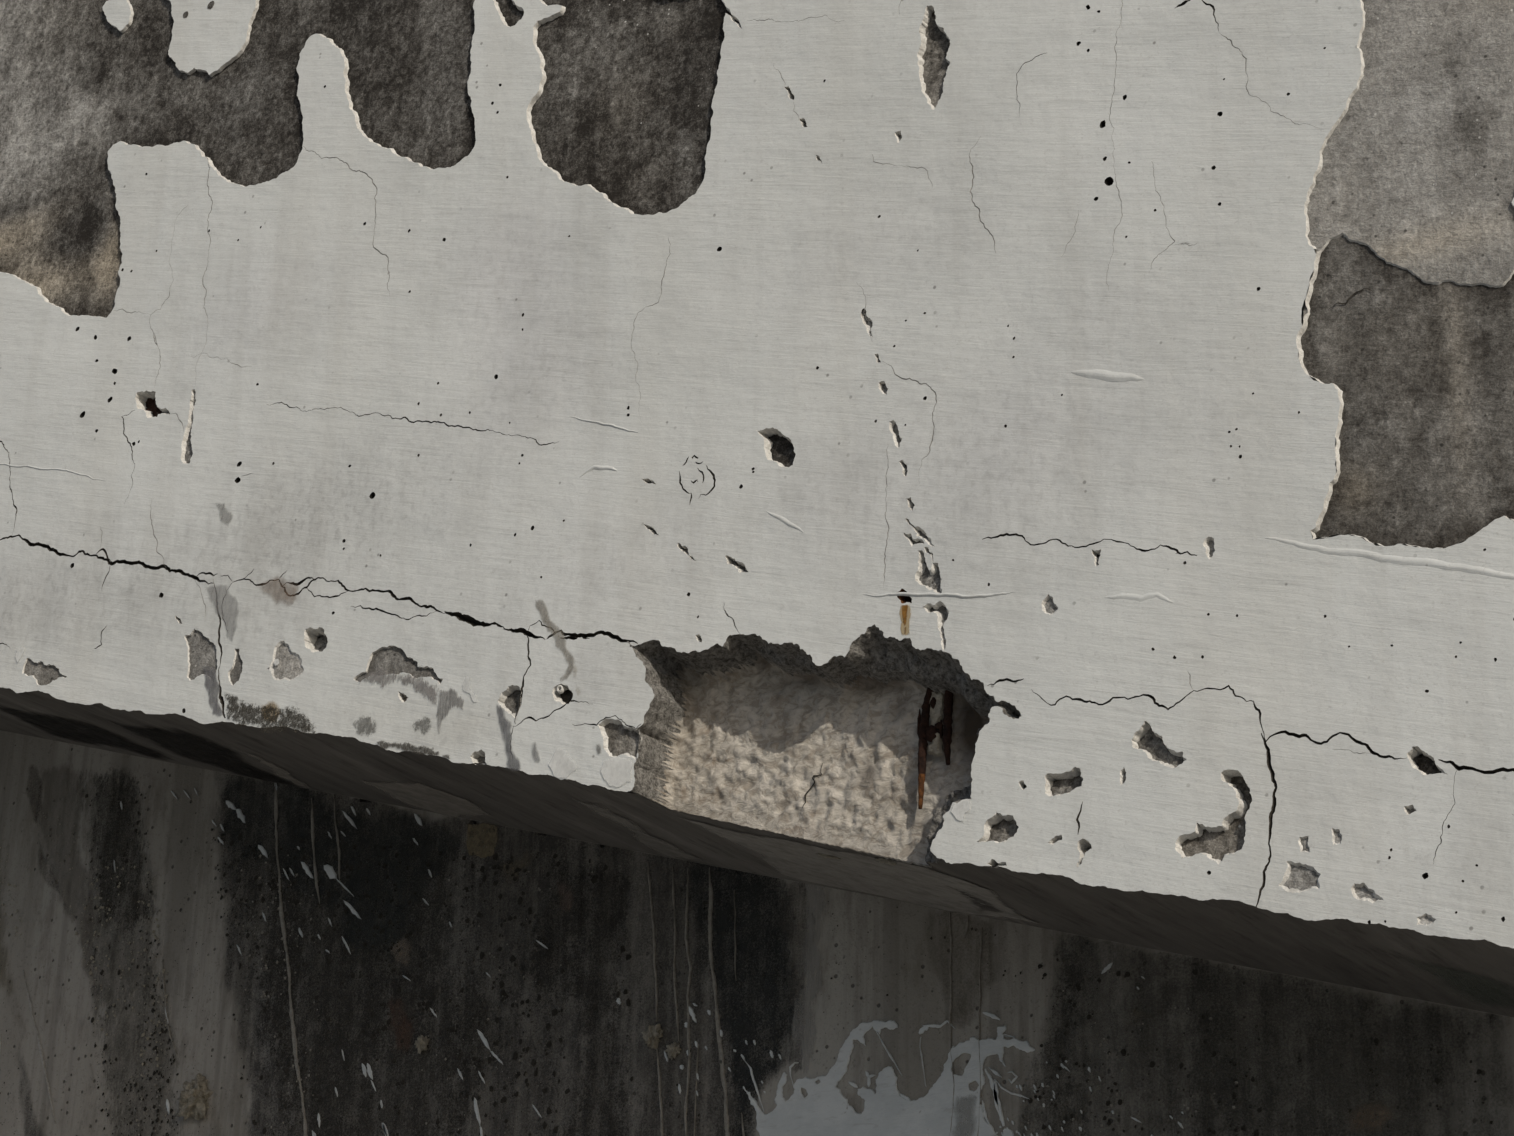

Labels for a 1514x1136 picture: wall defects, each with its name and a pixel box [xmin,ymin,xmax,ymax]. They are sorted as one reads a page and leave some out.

peeling [0,0,476,340]
peeling [493,0,741,215]
peeling [917,5,950,110]
crack [1106,2,1197,290]
crack [1176,0,1317,128]
peeling [1296,0,1514,551]
crack [0,146,641,746]
leakage [0,706,1506,1136]
spalling [598,497,1021,868]
rust [900,605,910,635]
peeling [1175,769,1252,875]
crack [987,672,1514,908]